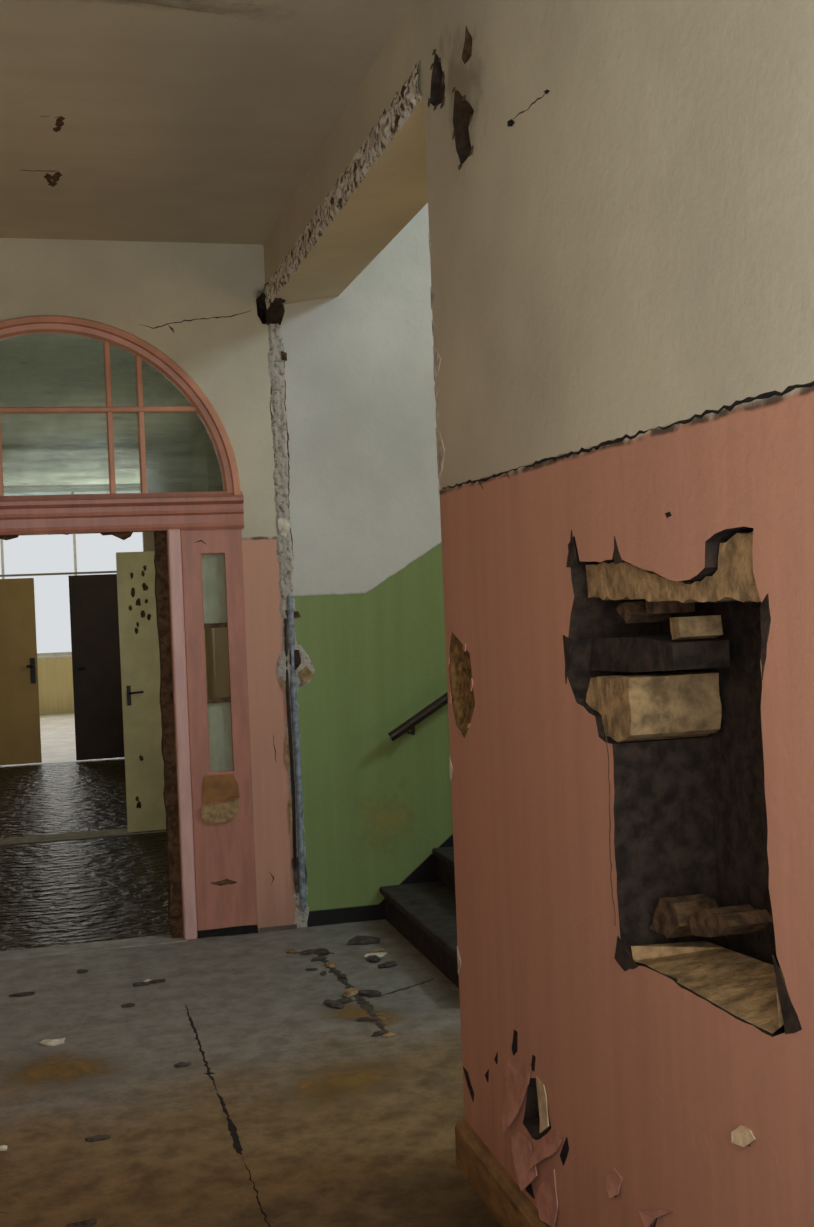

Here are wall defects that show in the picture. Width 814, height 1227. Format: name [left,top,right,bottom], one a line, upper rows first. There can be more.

spalling [462,28,472,63]
flaking render [264,49,475,928]
crack [442,381,814,489]
spalling [563,635,572,684]
spalling [566,530,802,1034]
crack [185,1004,271,1227]
peeling [463,1067,474,1102]
peeling [485,1029,569,1227]